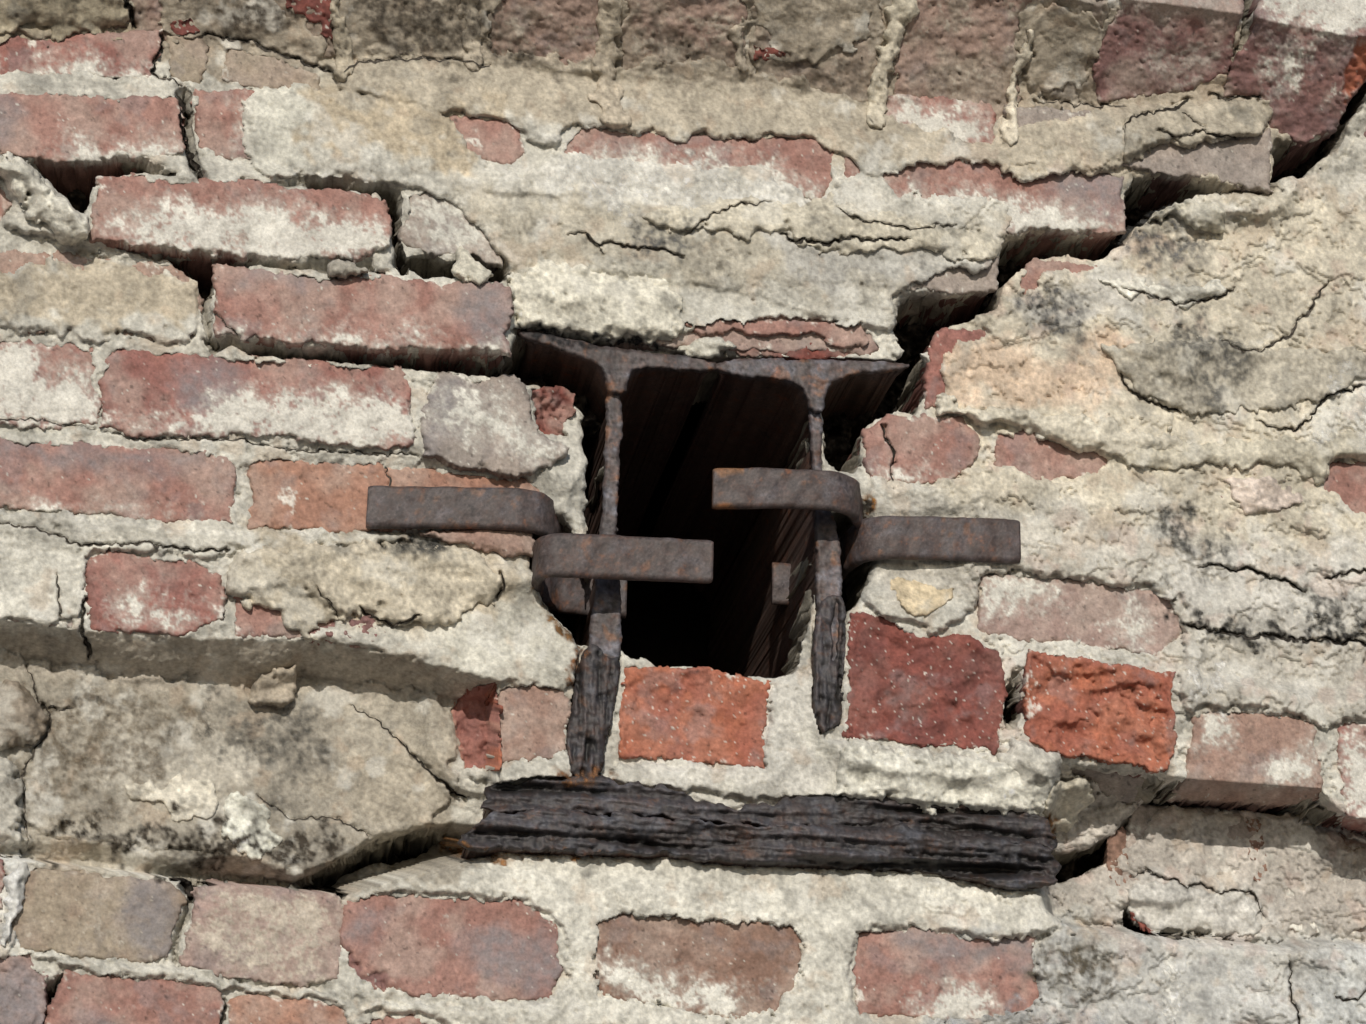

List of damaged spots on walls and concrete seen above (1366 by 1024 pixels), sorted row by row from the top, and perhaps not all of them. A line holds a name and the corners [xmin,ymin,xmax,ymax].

peeling [1122,97,1273,164]
crack [1271,90,1360,183]
crack [781,207,956,247]
crack [972,256,1049,320]
crack [894,323,940,360]
peeling [1101,335,1366,423]
peeling [957,405,1366,516]
corrosion [542,603,586,685]
corrosion [557,767,611,787]
peeling [124,772,283,860]
corrosion [439,837,520,866]
crack [1055,840,1106,883]